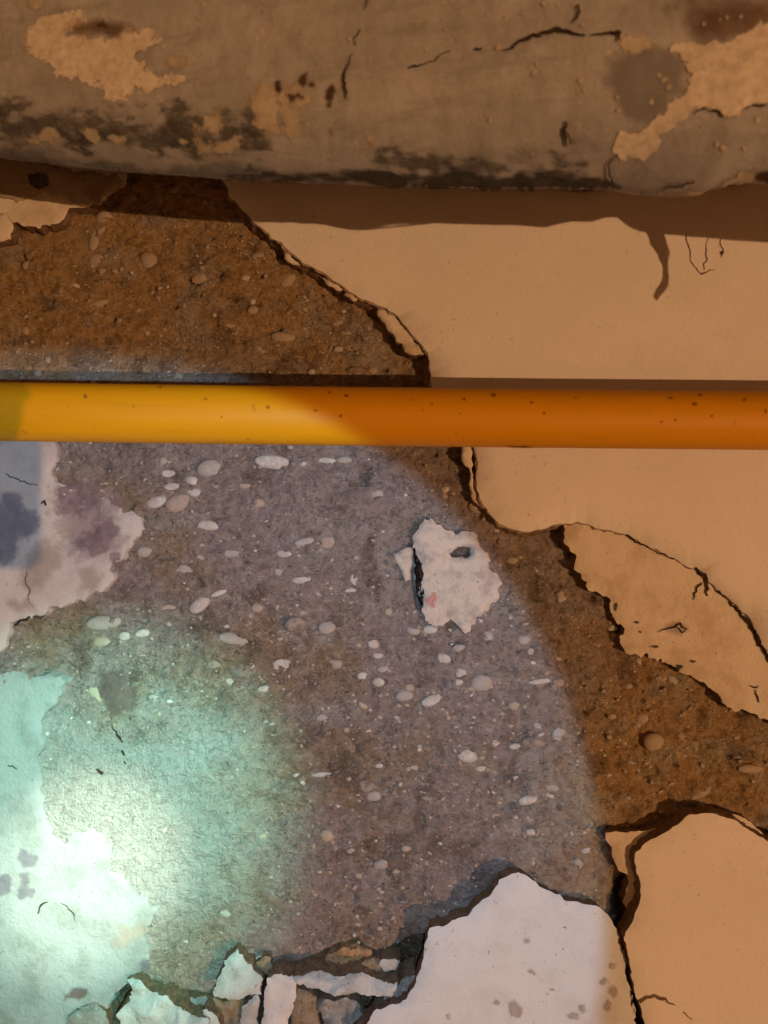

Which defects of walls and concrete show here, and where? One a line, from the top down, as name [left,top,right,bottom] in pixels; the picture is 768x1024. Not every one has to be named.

peeling [14,0,188,103]
peeling [249,80,311,139]
water stain [0,97,621,192]
crack [409,5,621,69]
peeling [611,20,768,162]
spalling [0,158,424,388]
water stain [56,481,120,566]
crack [626,534,768,662]
water stain [99,672,136,716]
spalling [0,441,768,1024]
water stain [0,850,36,899]
crack [619,937,692,1024]